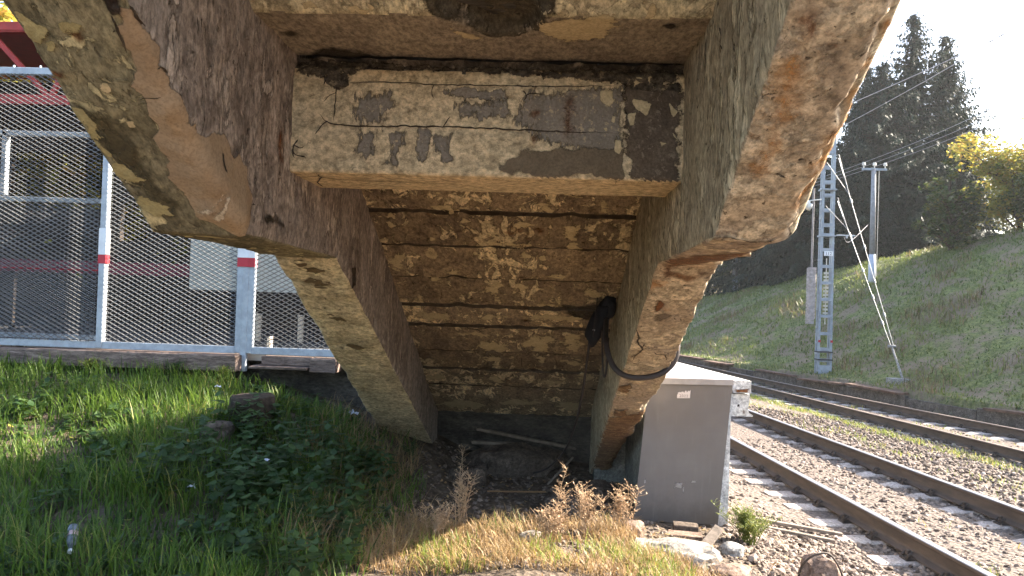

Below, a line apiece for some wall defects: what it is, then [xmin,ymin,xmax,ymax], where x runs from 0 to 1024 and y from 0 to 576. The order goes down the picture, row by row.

spalling [424,0,622,42]
peeling [69,102,174,217]
crack [292,76,615,187]
peeling [296,59,684,184]
peeling [431,192,490,224]
peeling [513,203,555,229]
peeling [563,226,582,262]
peeling [458,280,595,383]
crack [632,330,667,361]
spalling [593,407,646,470]